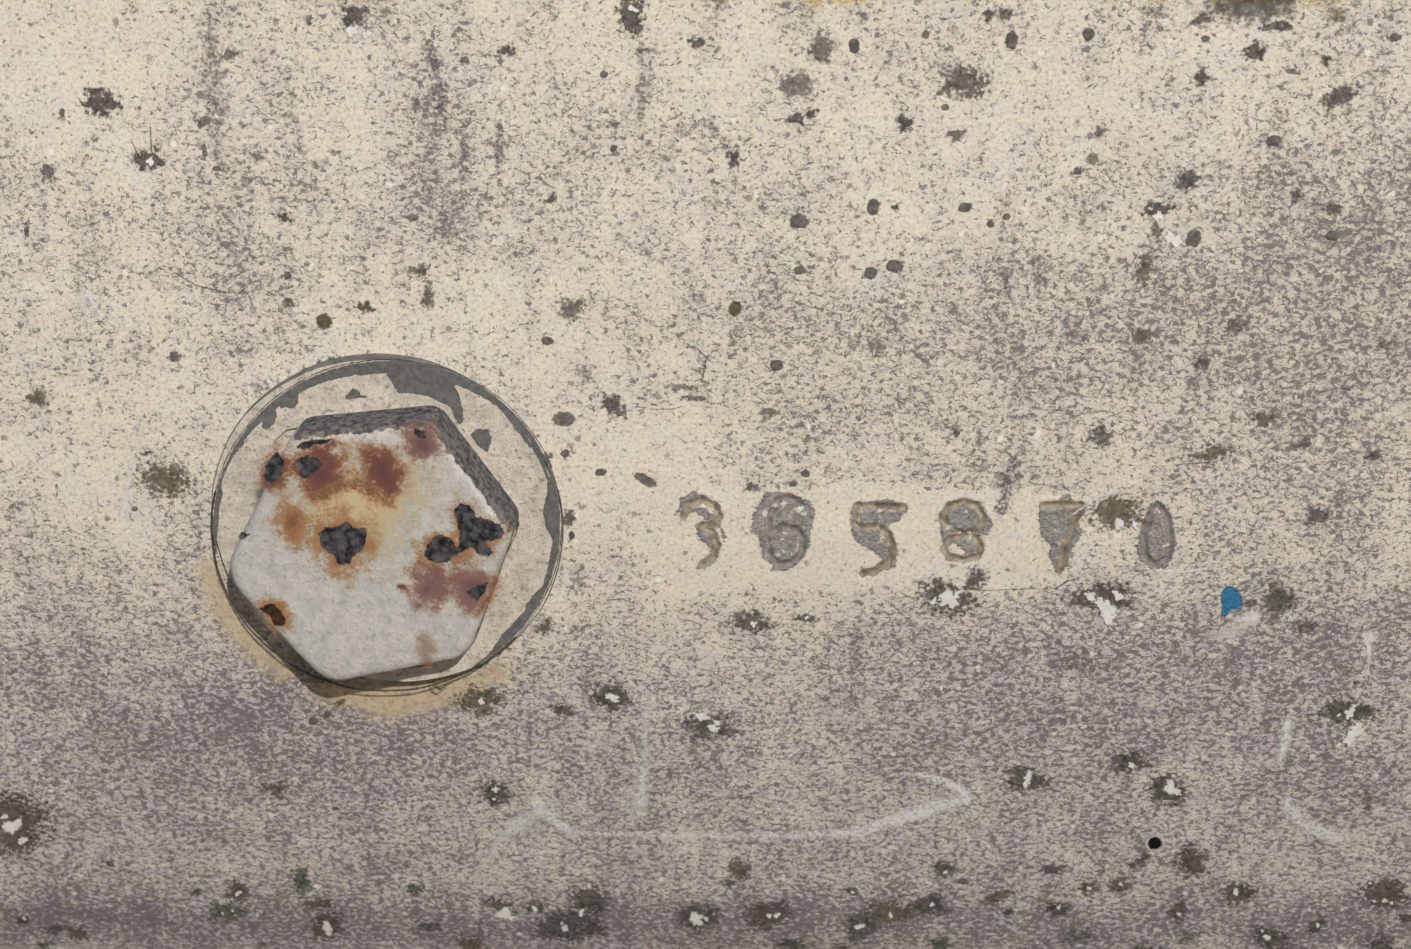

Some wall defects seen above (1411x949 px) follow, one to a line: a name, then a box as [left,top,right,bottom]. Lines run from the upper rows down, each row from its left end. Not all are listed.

rust [257,598,293,630]
rust [259,423,507,614]